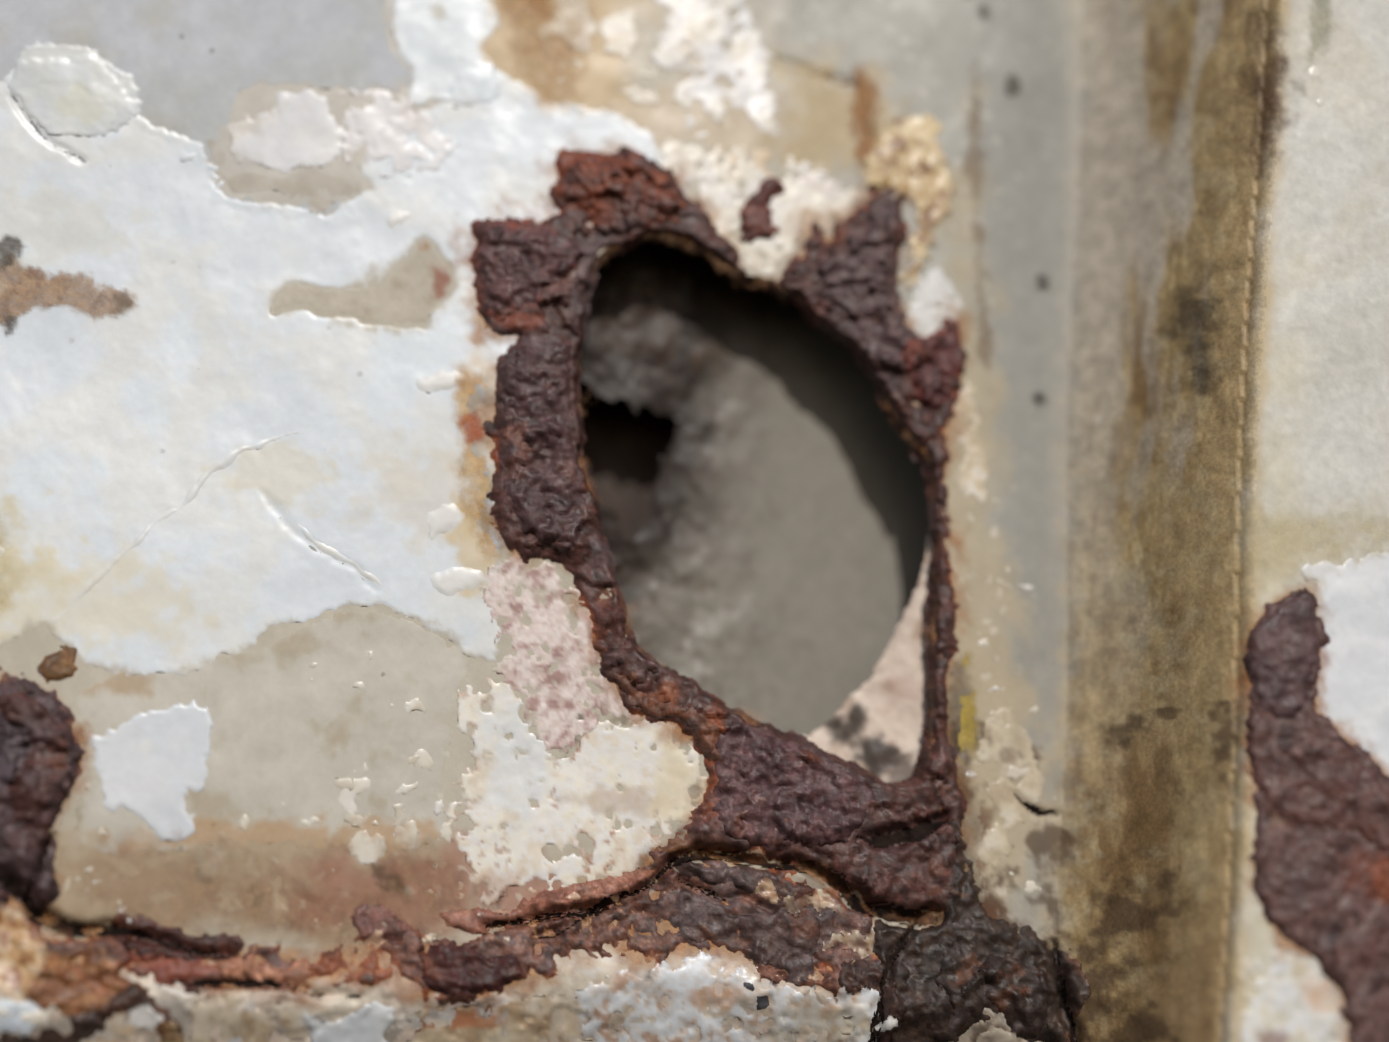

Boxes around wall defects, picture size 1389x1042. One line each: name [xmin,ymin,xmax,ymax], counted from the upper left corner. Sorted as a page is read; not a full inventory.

peeling [421,933,437,945]
peeling [0,0,965,916]
corrosion [0,146,1091,1042]
peeling [951,379,989,503]
corrosion [1237,587,1389,1042]
peeling [1299,552,1389,775]